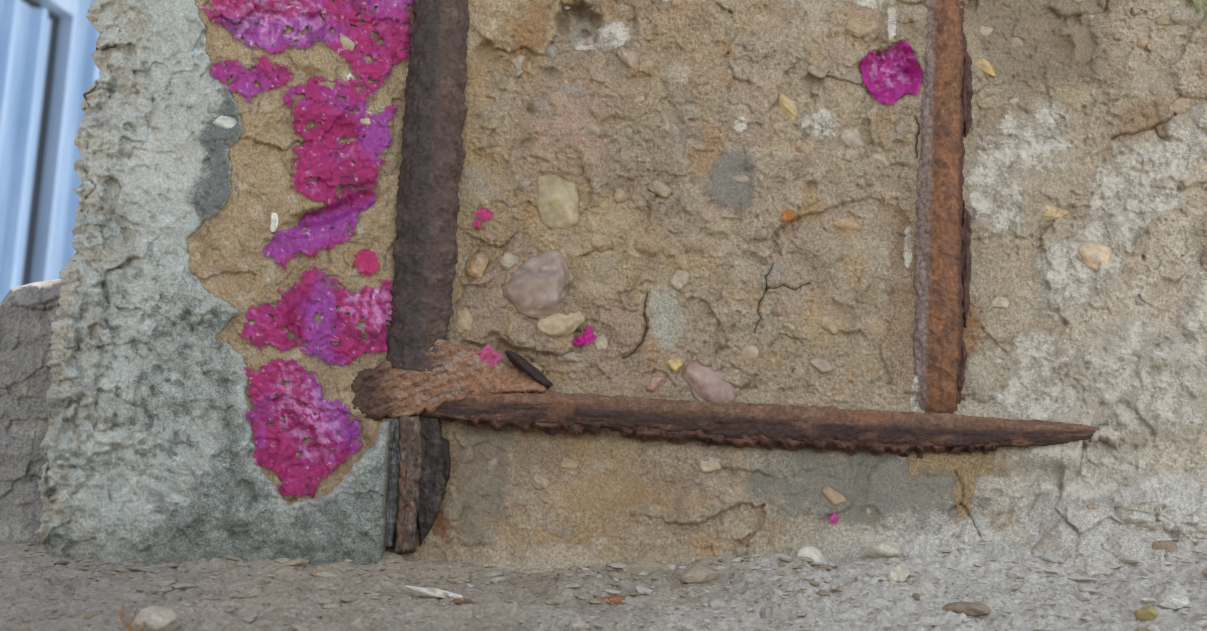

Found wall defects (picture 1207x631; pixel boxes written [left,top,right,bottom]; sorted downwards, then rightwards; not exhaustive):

corrosion [962,50,973,137]
spalling [187,0,1207,582]
crack [754,264,809,333]
corrosion [958,200,981,392]
corrosion [351,339,553,554]
corrosion [466,415,1007,523]